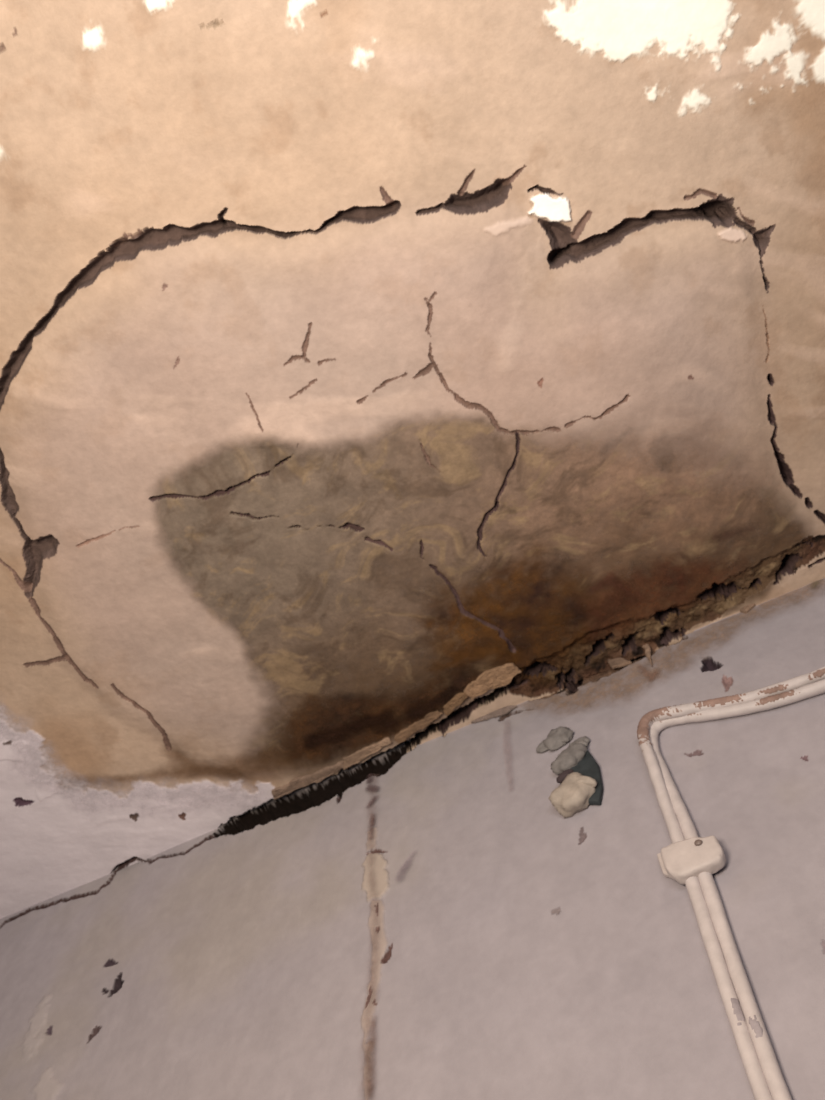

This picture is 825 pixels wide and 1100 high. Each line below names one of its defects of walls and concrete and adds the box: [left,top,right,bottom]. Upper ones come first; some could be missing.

peeling [81,24,105,53]
crack [0,185,402,412]
peeling [285,0,329,31]
crack [355,291,631,557]
spalling [415,164,572,238]
peeling [542,0,740,72]
crack [537,187,825,525]
peeling [677,88,711,117]
peeling [744,0,825,87]
crack [0,447,393,751]
water stain [158,419,825,774]
crack [0,540,534,929]